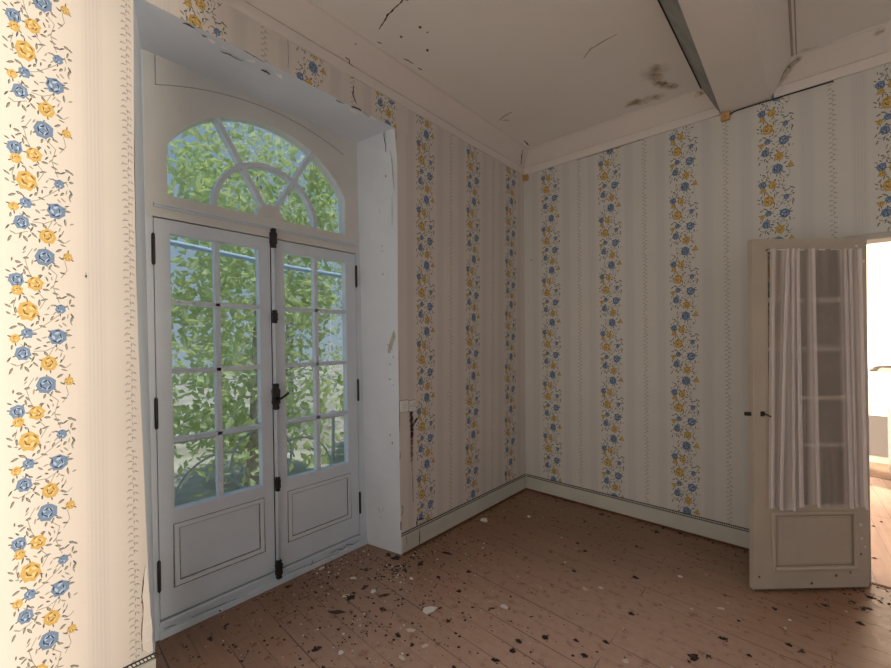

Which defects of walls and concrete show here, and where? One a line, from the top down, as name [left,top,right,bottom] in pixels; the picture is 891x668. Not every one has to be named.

crack [379,0,408,29]